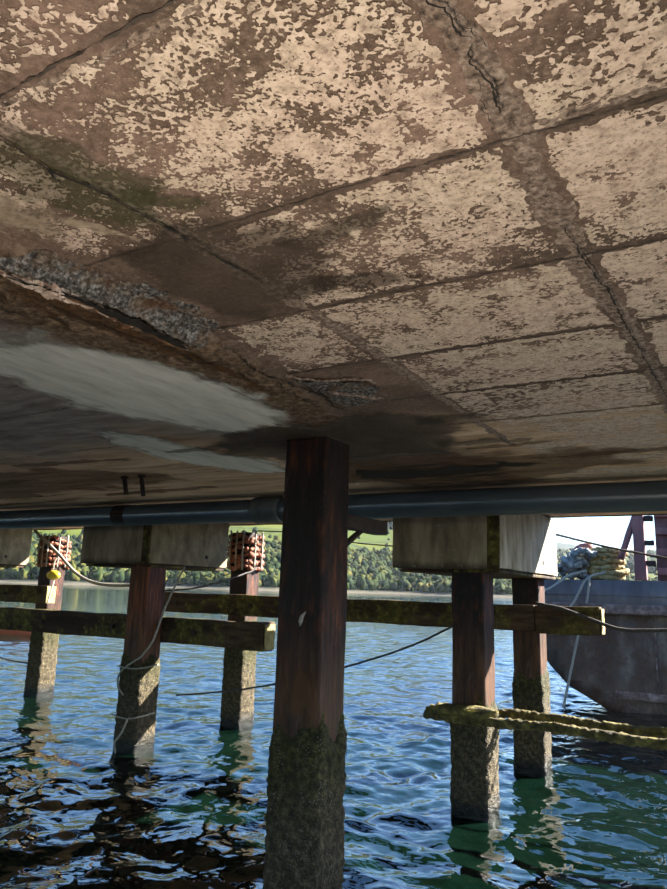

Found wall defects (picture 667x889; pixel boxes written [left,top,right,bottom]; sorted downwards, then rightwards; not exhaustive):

crack [425,0,523,131]
peeling [0,0,667,478]
crack [544,188,667,396]
water stain [167,414,531,460]